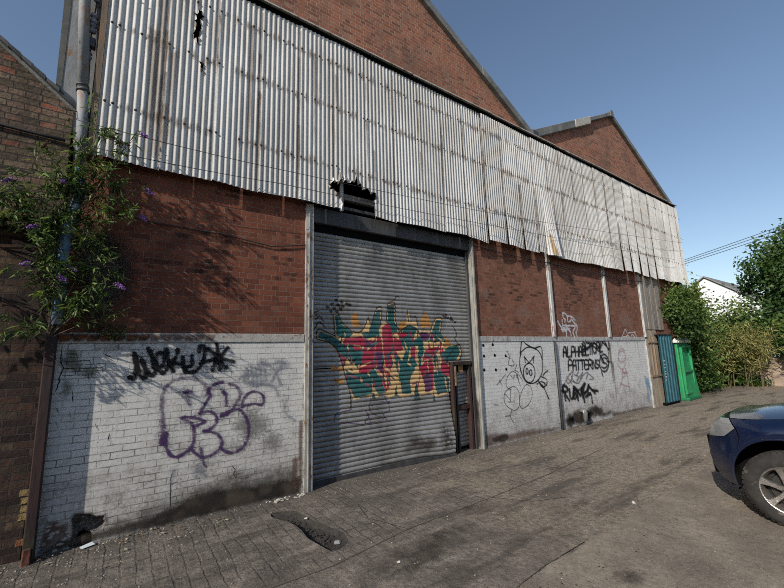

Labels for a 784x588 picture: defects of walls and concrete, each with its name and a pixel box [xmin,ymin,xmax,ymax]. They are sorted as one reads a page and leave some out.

peeling [328,172,377,218]
water stain [566,406,646,427]
spalling [40,513,107,556]
water stain [53,474,300,549]